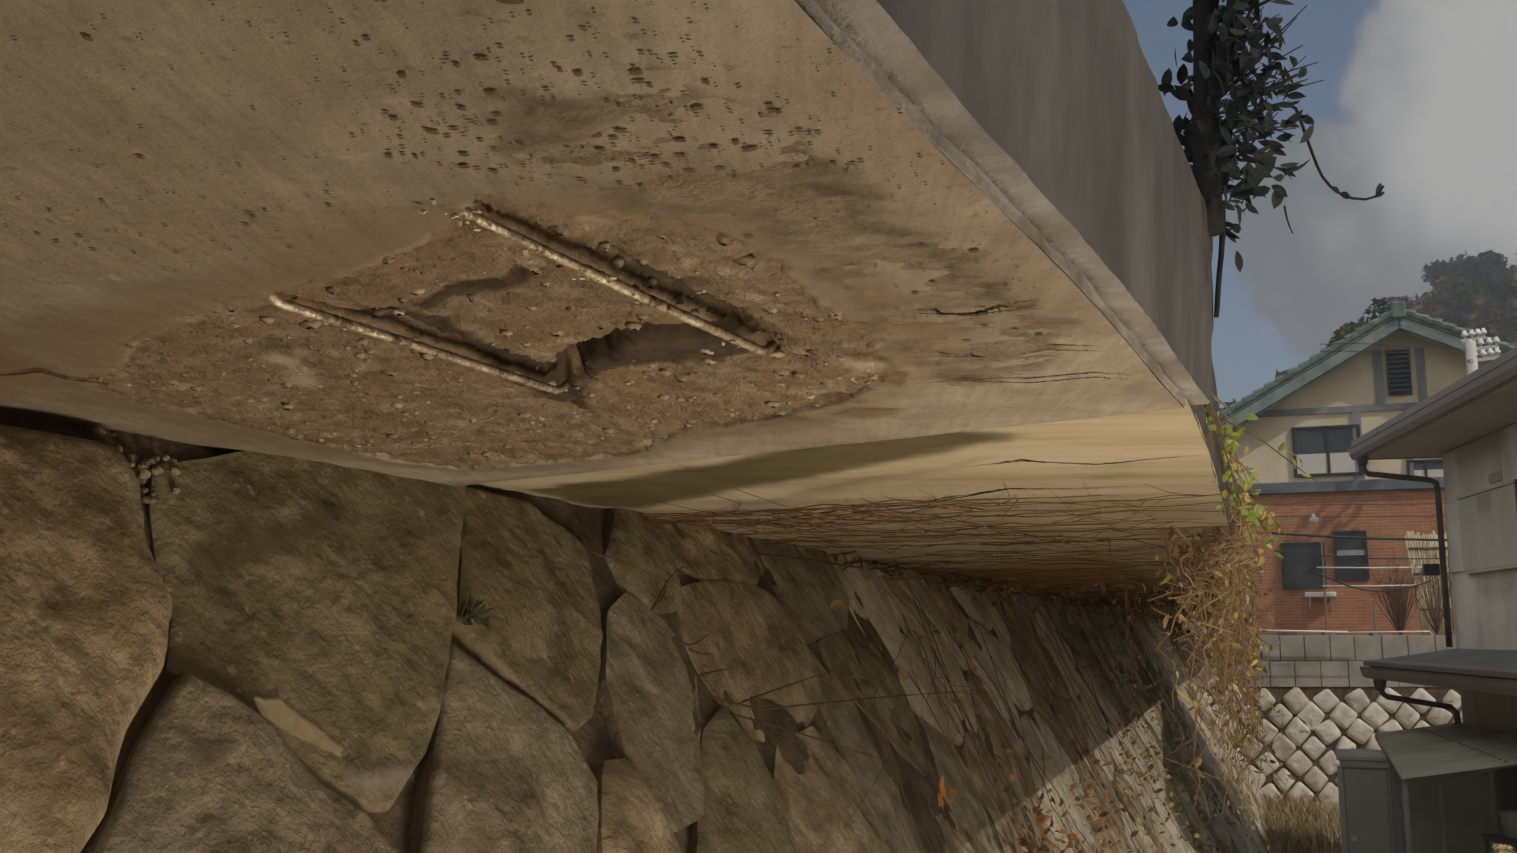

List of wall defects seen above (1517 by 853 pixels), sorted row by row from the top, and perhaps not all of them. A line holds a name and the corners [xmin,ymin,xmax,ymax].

crack [0,370,123,385]
spalling [88,193,906,469]